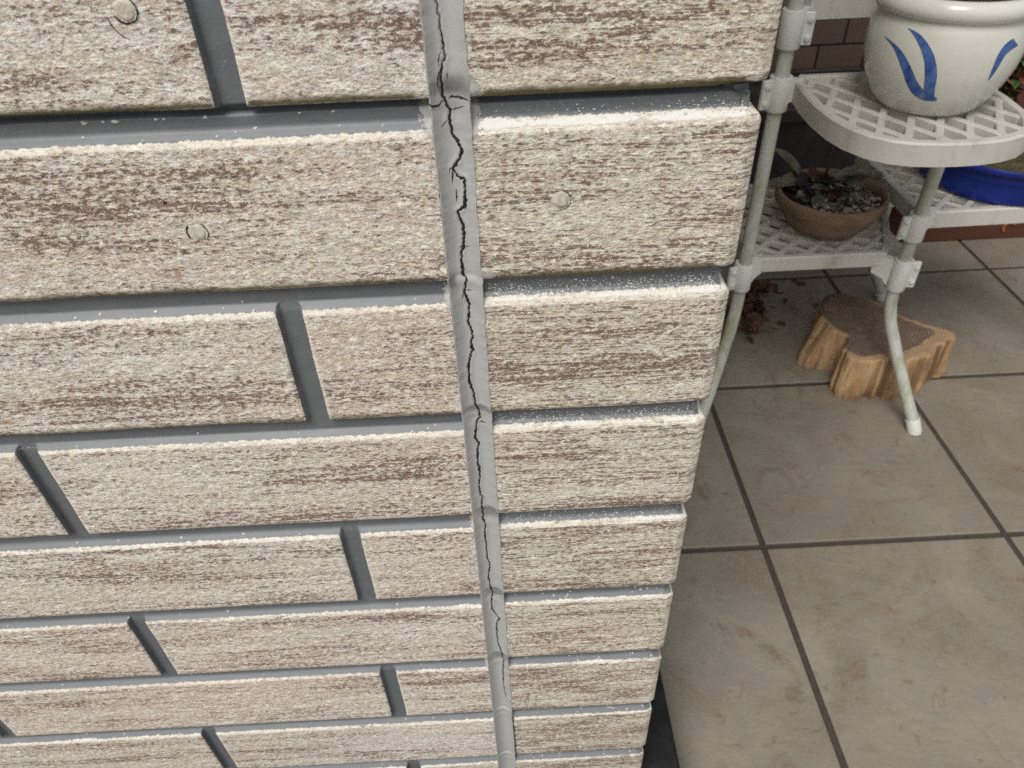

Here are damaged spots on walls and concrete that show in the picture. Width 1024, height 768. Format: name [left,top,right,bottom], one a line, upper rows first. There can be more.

crack [428,0,517,757]